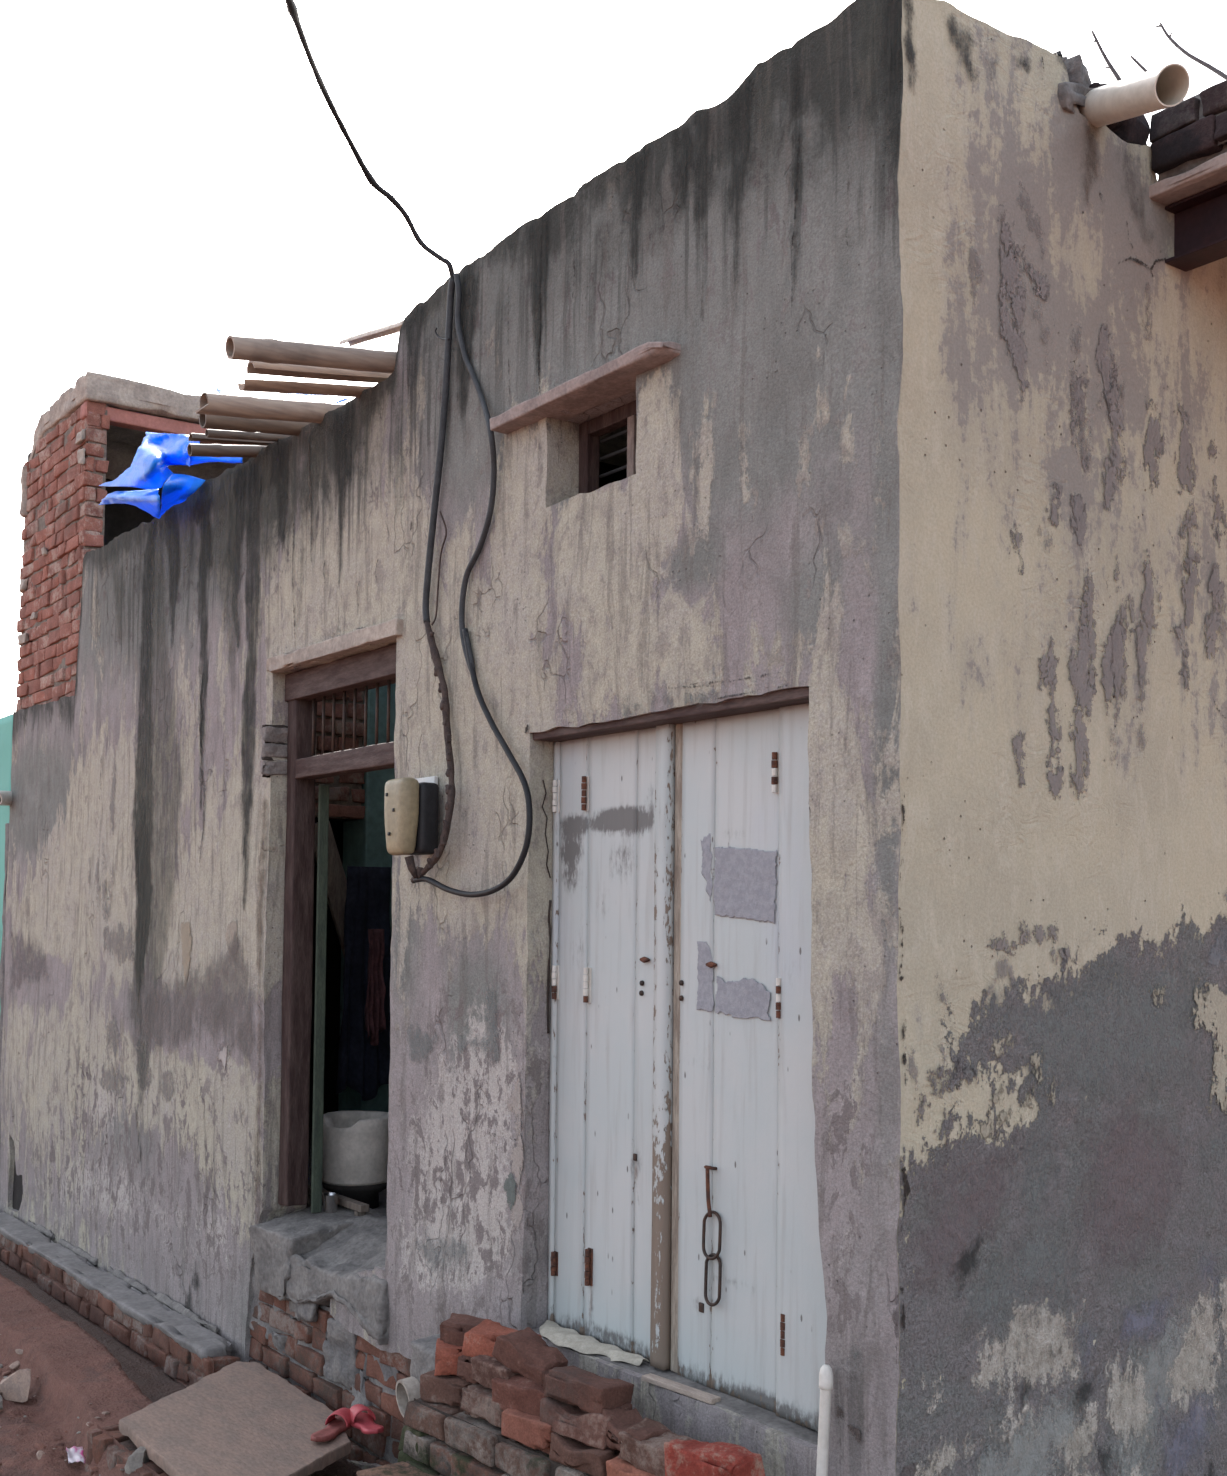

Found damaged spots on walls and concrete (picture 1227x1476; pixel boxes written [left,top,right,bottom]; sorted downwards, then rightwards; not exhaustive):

damp [859,0,915,164]
damp [948,16,975,78]
damp [630,148,648,275]
damp [727,83,768,281]
damp [402,305,422,376]
damp [457,267,479,411]
damp [530,215,548,366]
peeling [969,181,1050,401]
peeling [1009,323,1227,800]
damp [133,441,292,1086]
peeling [987,920,1071,995]
peeling [906,1044,979,1146]